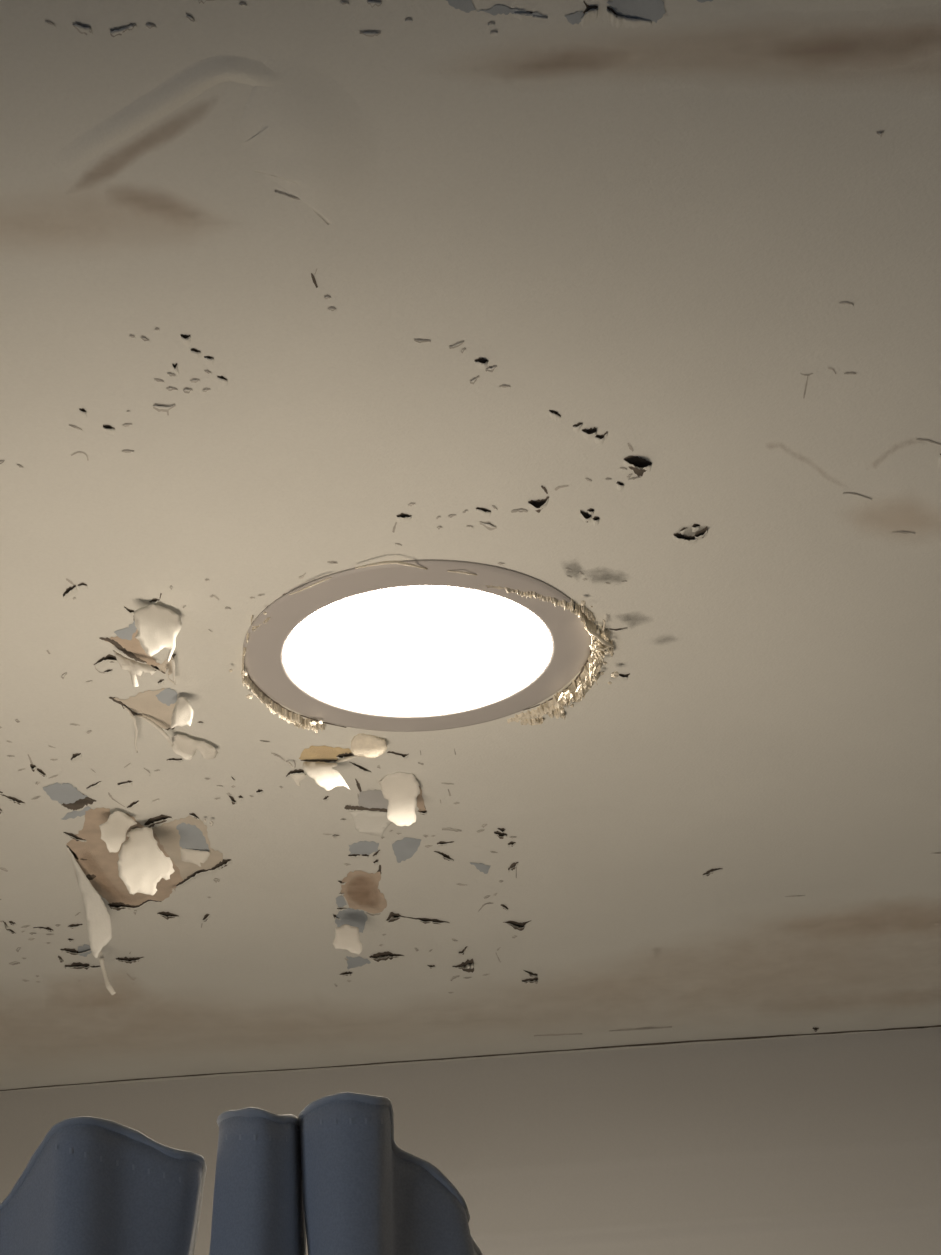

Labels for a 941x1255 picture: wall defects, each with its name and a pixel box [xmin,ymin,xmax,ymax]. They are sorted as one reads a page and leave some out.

peeling [446,0,547,36]
peeling [565,0,666,30]
peeling [0,586,232,996]
peeling [204,777,263,805]
peeling [260,734,462,987]
peeling [470,824,532,938]
peeling [448,939,489,994]
peeling [522,970,538,984]